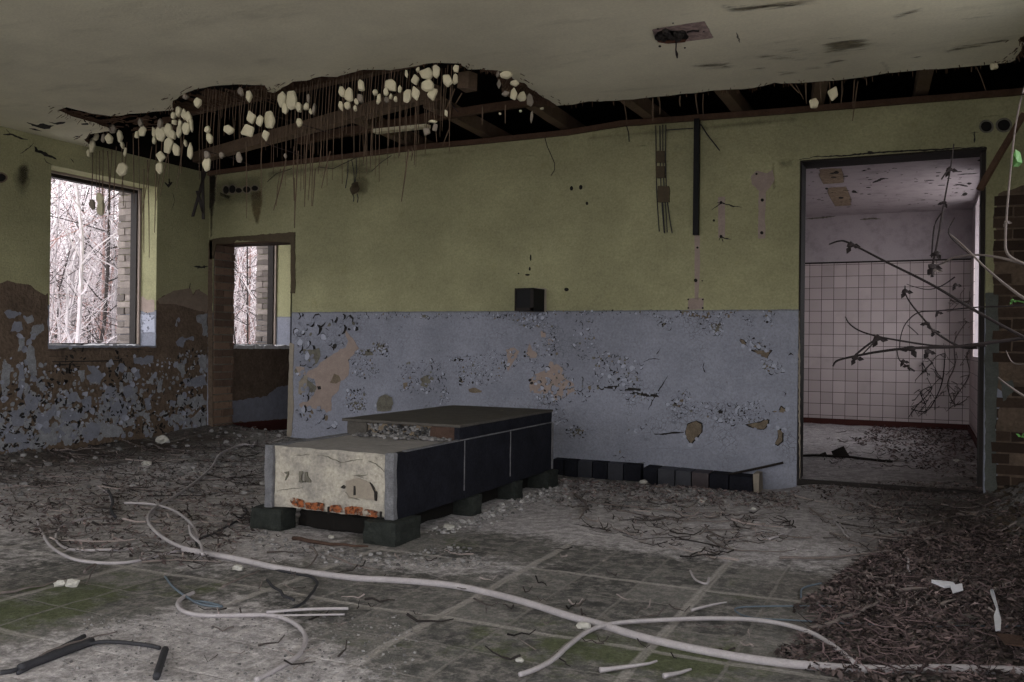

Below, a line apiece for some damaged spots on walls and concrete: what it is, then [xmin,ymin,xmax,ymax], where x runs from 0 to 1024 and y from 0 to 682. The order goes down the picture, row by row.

flaking render [27,122,65,131]
spalling [979,118,1012,133]
peeling [0,280,208,454]
flaking render [232,309,790,447]